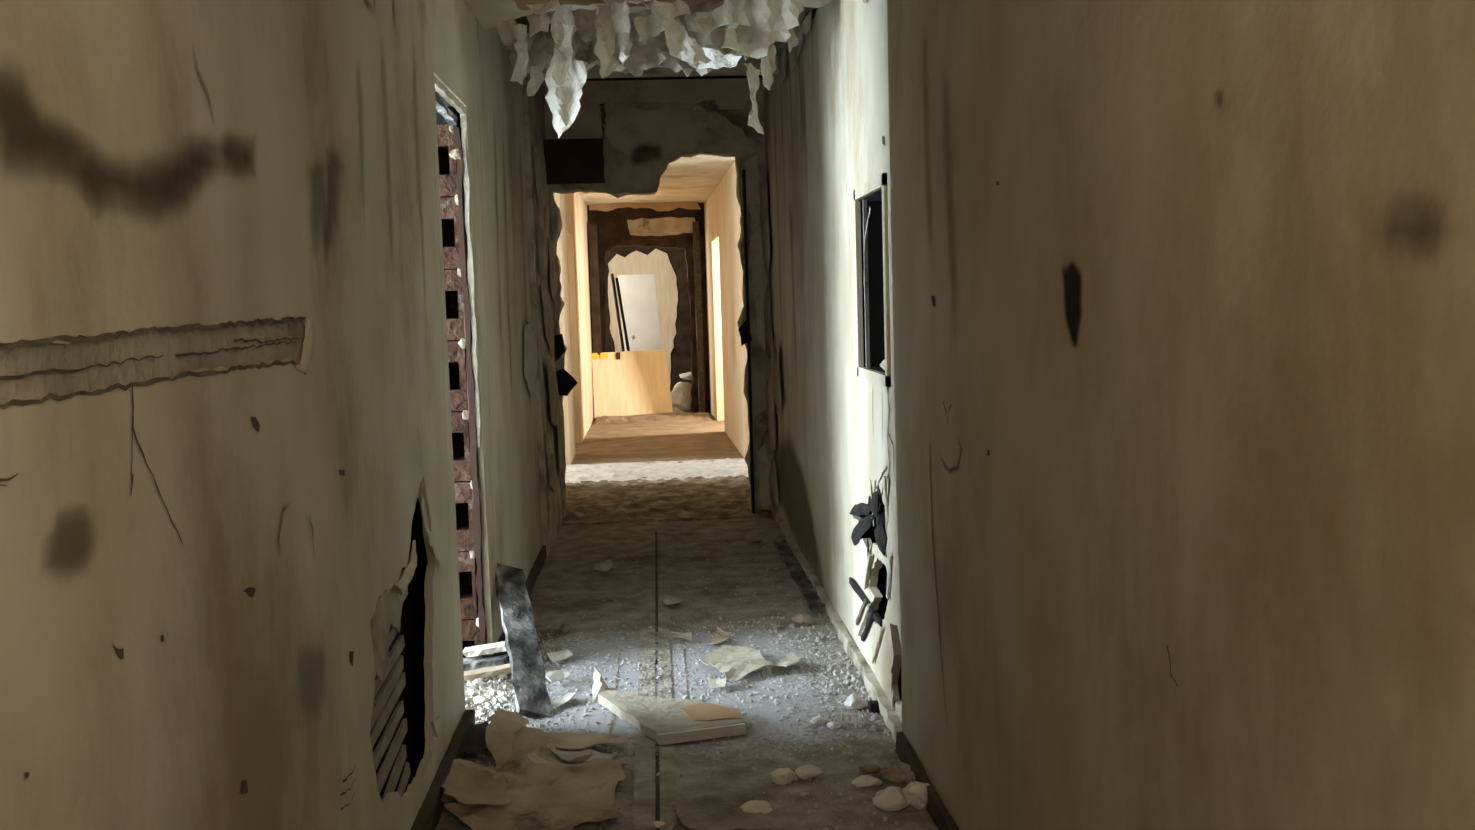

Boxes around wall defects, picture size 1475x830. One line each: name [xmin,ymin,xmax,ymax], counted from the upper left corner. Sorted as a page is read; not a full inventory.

peeling [778,8,819,84]
leakage [0,79,252,210]
spalling [0,316,314,408]
spalling [533,103,771,507]
spalling [370,457,446,802]
spalling [849,475,892,664]
spalling [889,667,902,711]